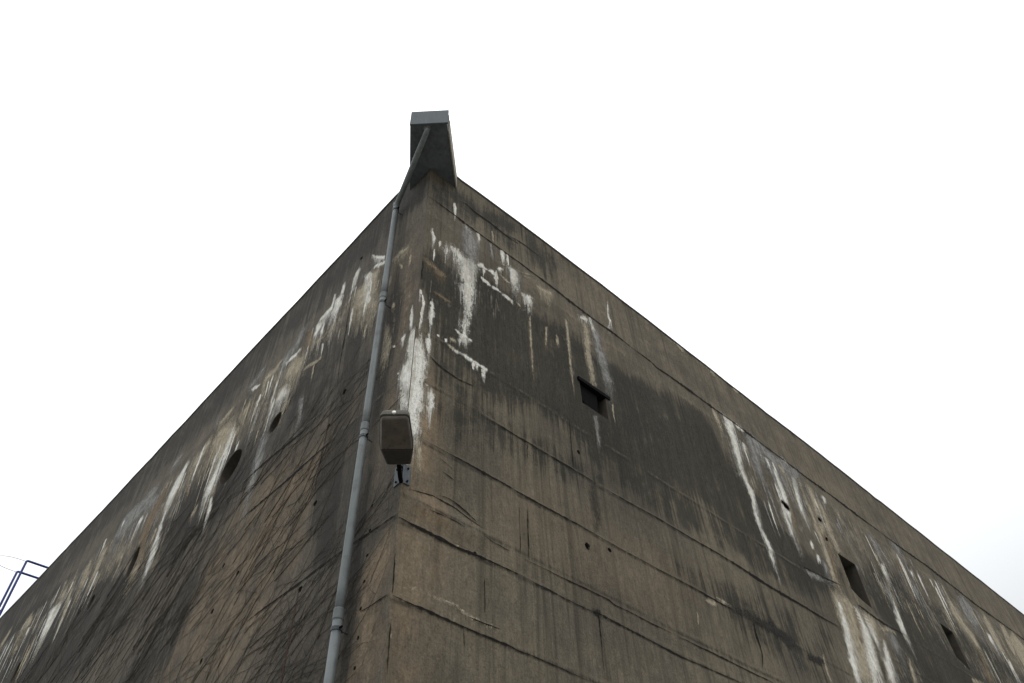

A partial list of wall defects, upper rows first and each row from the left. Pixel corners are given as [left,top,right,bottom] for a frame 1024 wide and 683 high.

efflorescence [0,247,412,683]
crack [241,280,355,516]
efflorescence [383,226,552,464]
crack [248,439,773,683]
efflorescence [580,316,612,384]
crack [433,199,1024,640]
efflorescence [713,410,1024,683]